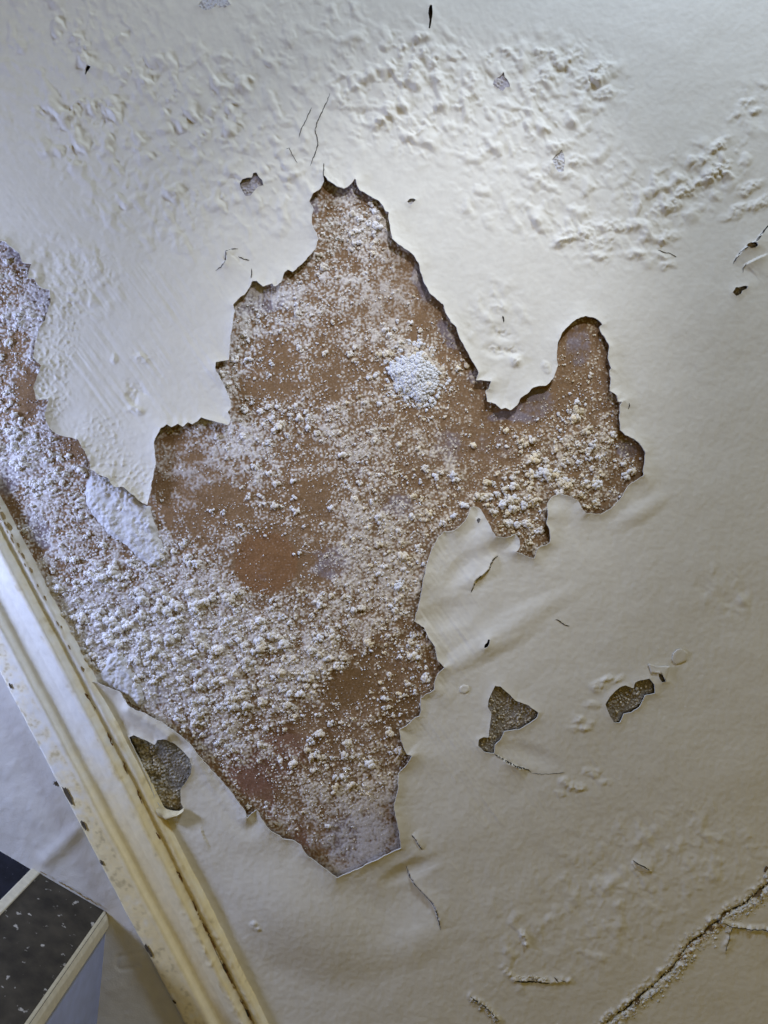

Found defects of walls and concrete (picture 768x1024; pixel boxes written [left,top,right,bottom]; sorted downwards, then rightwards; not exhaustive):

water stain [384,339,451,412]
peeling [0,164,655,888]
peeling [601,673,670,726]
crack [601,866,768,1024]